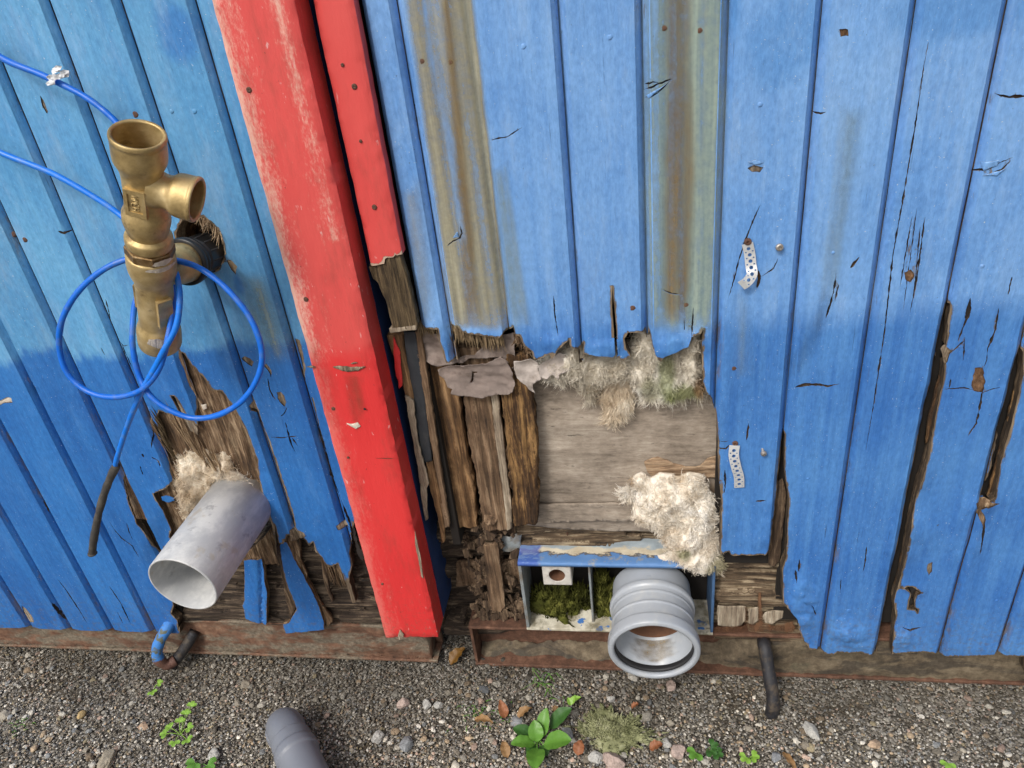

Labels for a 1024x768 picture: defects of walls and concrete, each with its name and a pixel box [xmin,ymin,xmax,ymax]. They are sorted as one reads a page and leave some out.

crack [730,214,774,291]
crack [875,179,923,391]
peeling [296,339,315,377]
spalling [333,362,366,372]
peeling [250,397,305,541]
spalling [415,533,424,579]